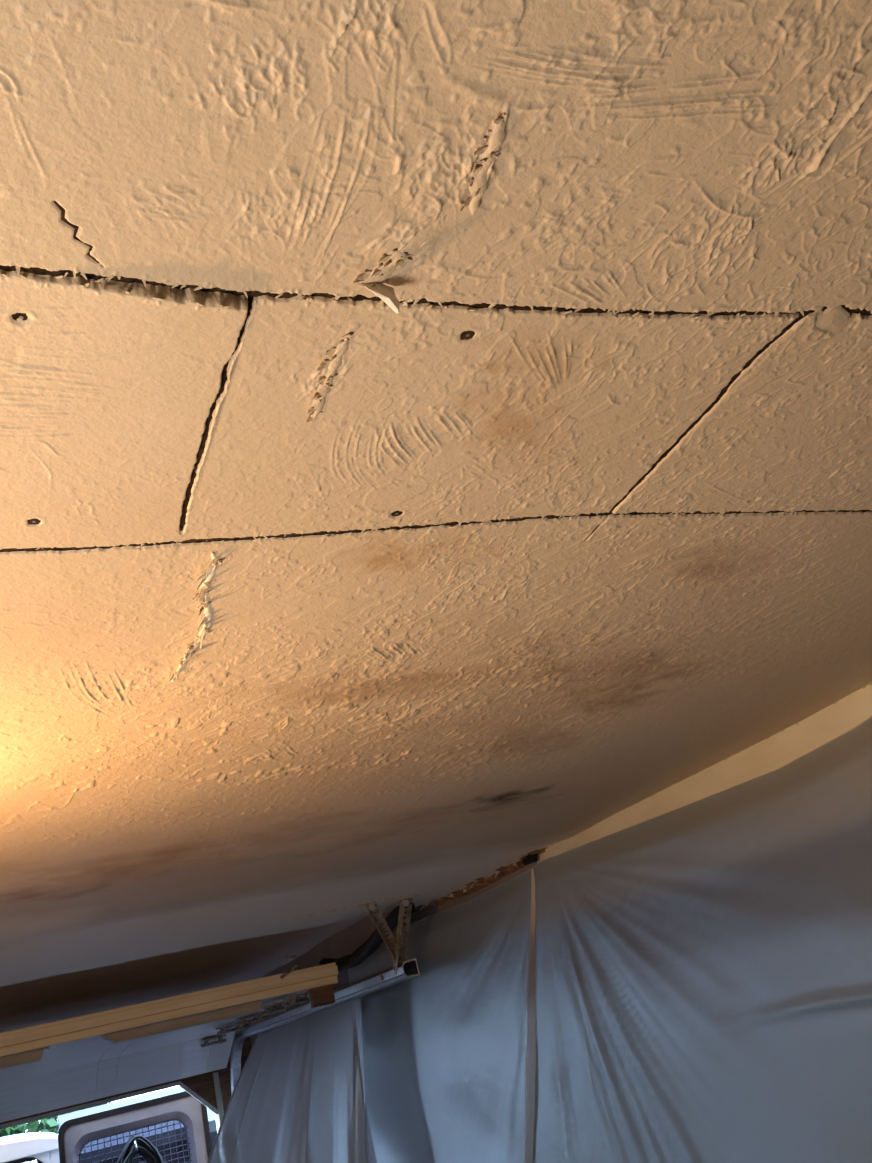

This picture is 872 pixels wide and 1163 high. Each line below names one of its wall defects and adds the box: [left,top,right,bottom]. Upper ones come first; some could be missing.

crack [0,201,872,552]
peeling [415,847,547,910]